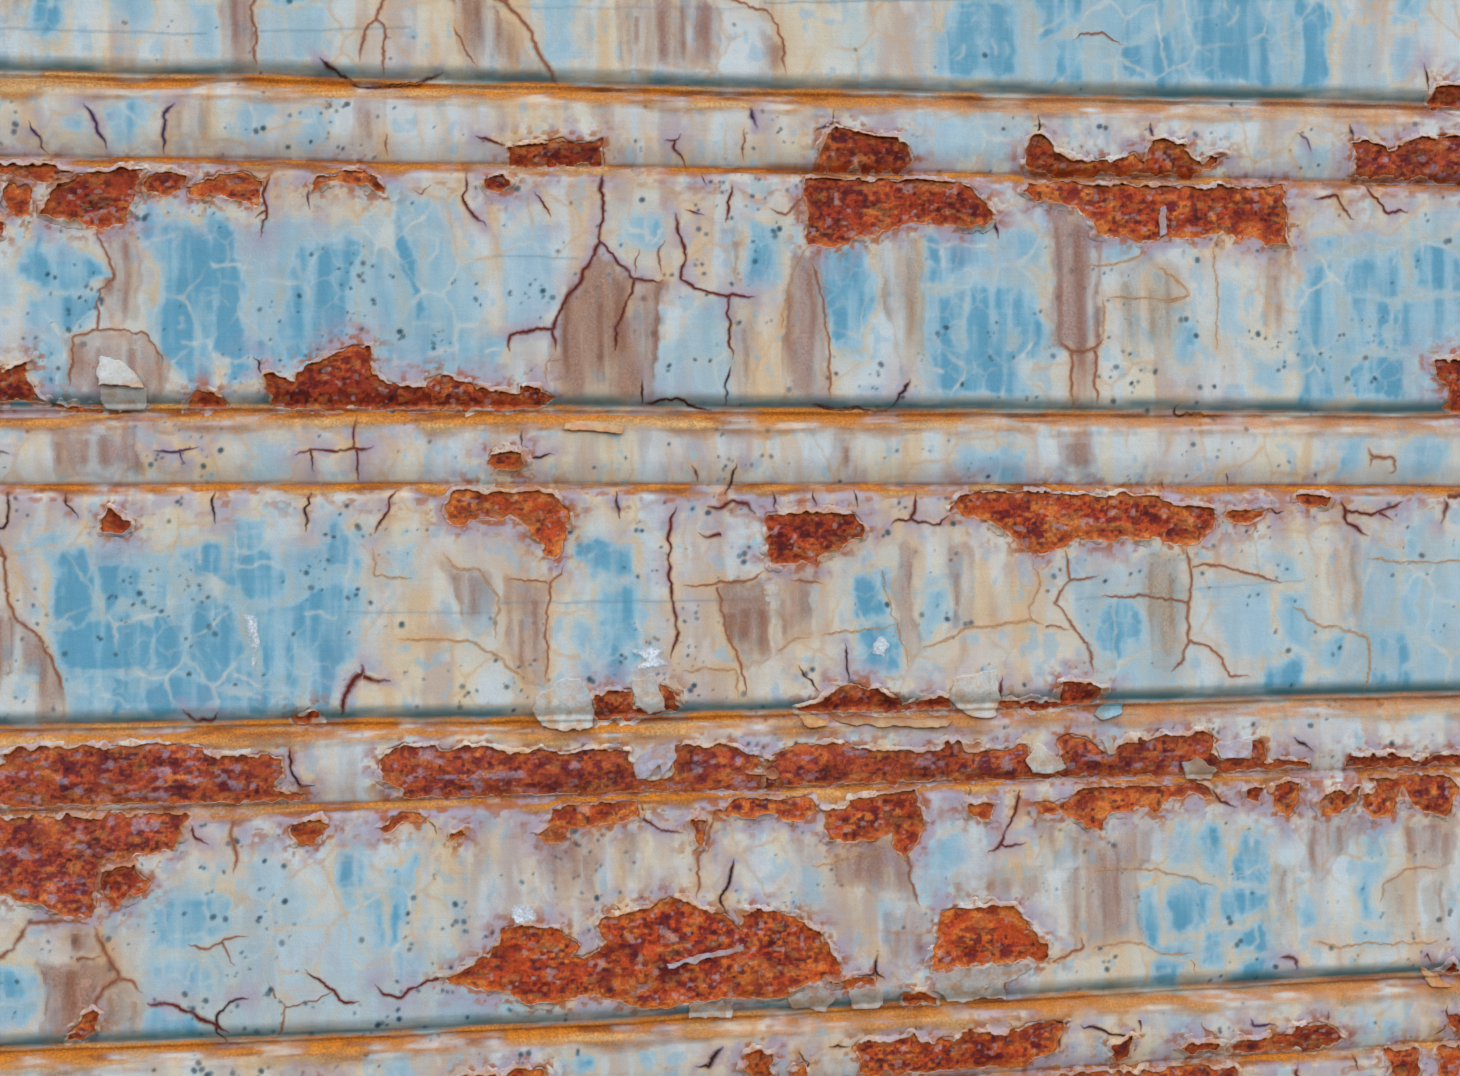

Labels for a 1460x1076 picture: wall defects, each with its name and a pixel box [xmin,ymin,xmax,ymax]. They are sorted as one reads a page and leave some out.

rust [71,157,625,176]
crack [741,109,756,154]
crack [507,136,910,412]
rust [0,259,1223,465]
rust [117,482,449,497]
rust [731,483,1146,497]
rust [1173,485,1460,496]
crack [0,497,63,689]
crack [780,551,1371,691]
rust [191,781,1025,821]
peeling [373,670,1460,857]
rust [0,961,1460,1073]